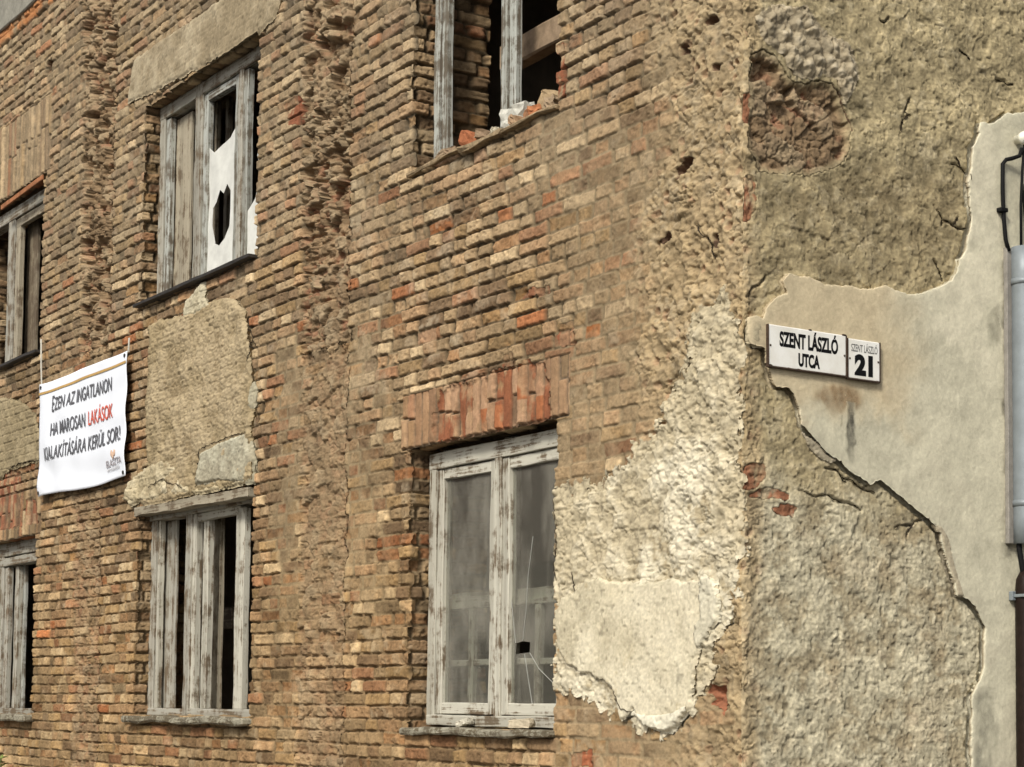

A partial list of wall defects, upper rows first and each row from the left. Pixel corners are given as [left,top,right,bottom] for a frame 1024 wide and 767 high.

spalling [742,50,852,222]
crack [938,211,967,230]
peeling [550,112,1024,767]
crack [799,468,875,511]